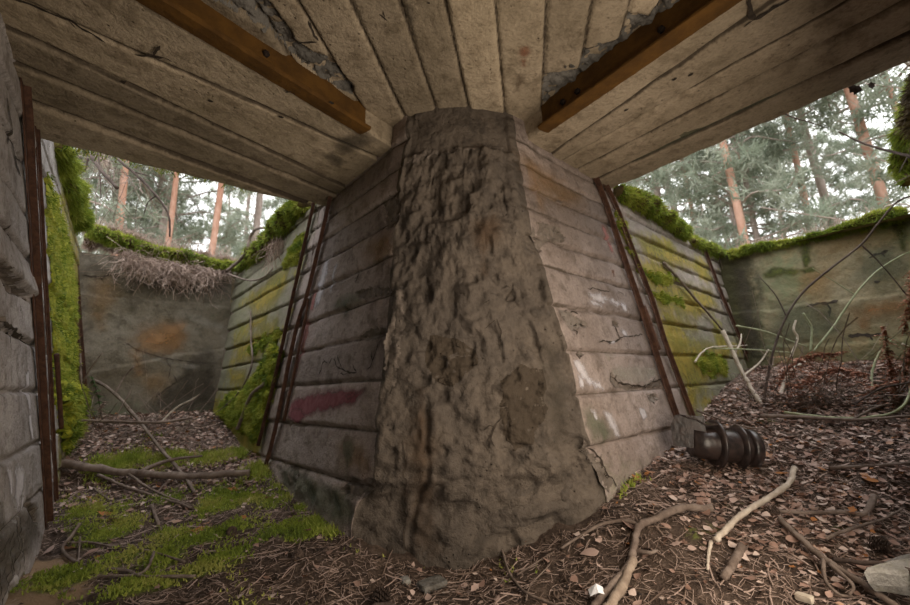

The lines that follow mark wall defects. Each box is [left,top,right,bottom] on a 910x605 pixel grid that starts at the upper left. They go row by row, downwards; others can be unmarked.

spalling [542,0,679,102]
crack [600,325,643,344]
crack [613,377,661,389]